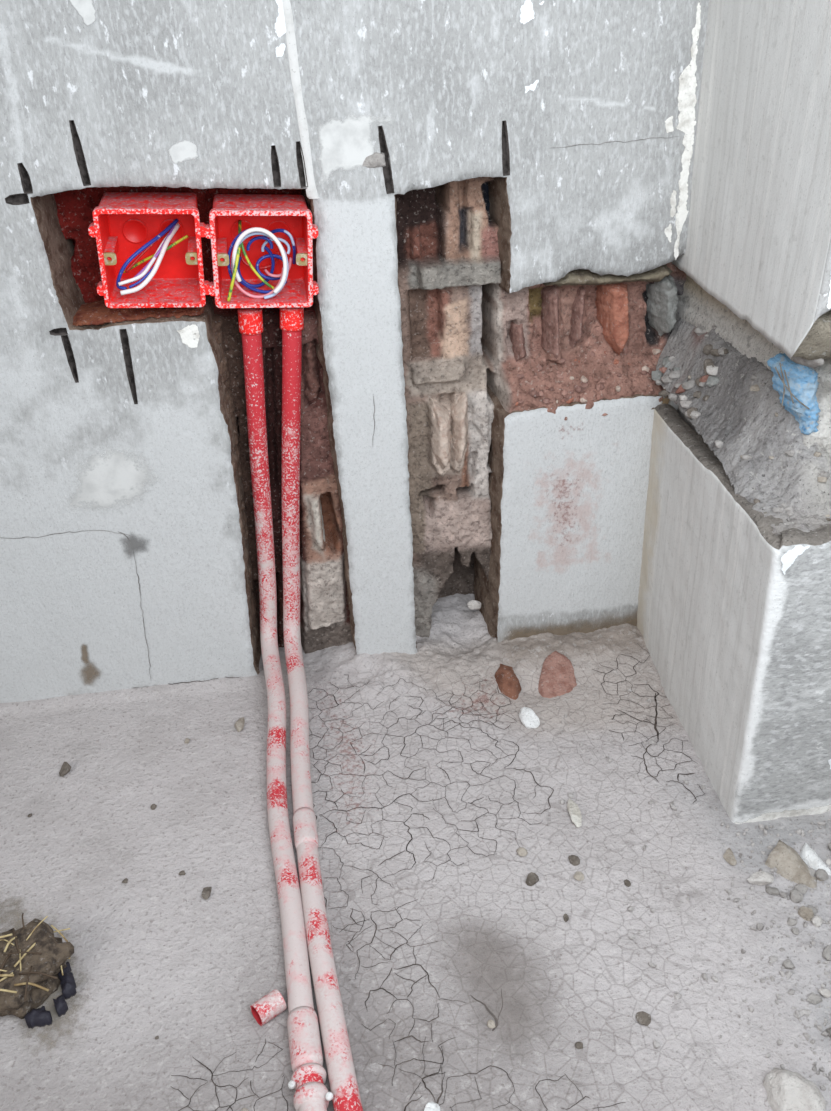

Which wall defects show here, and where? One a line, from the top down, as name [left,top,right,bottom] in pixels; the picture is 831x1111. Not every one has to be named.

flaking render [274,0,286,57]
spalling [395,0,831,638]
flaking render [54,186,302,647]
flaking render [300,306,353,654]
crack [1,530,239,688]
crack [617,693,659,781]
flaking render [735,805,831,824]
crack [471,989,503,1031]
crack [404,1075,445,1111]